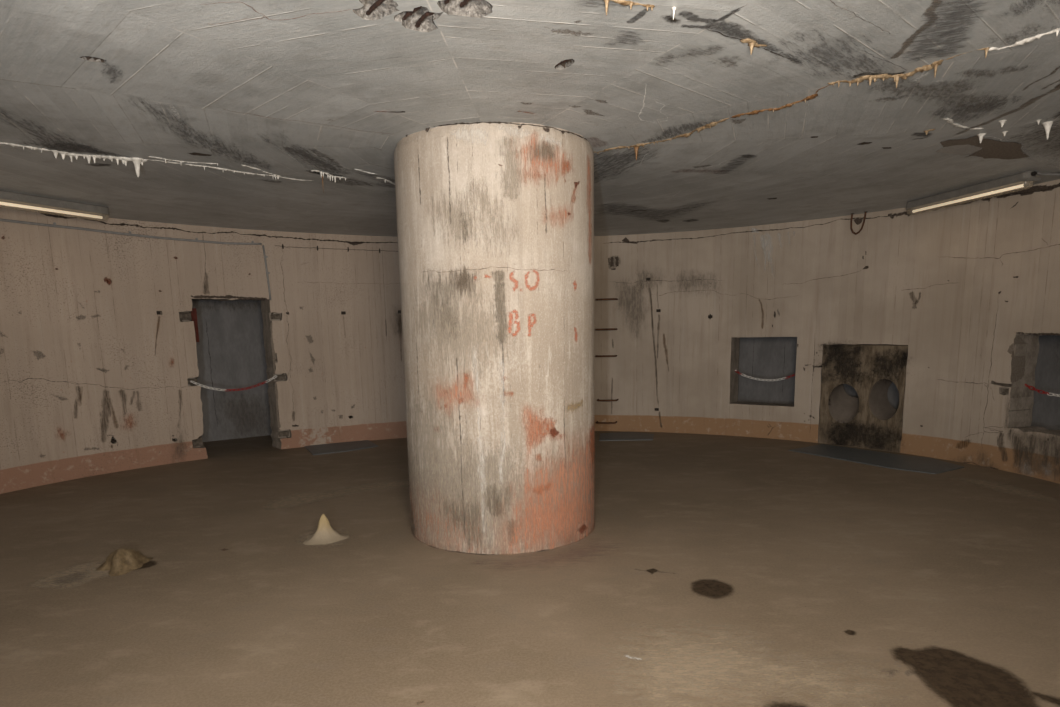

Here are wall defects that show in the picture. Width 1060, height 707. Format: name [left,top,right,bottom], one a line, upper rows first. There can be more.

spalling [356,0,491,32]
crack [706,5,797,62]
leakage [586,0,1060,179]
leakage [0,101,395,186]
peeling [936,135,1030,160]
corrosion [521,137,592,262]
corrosion [505,408,595,552]